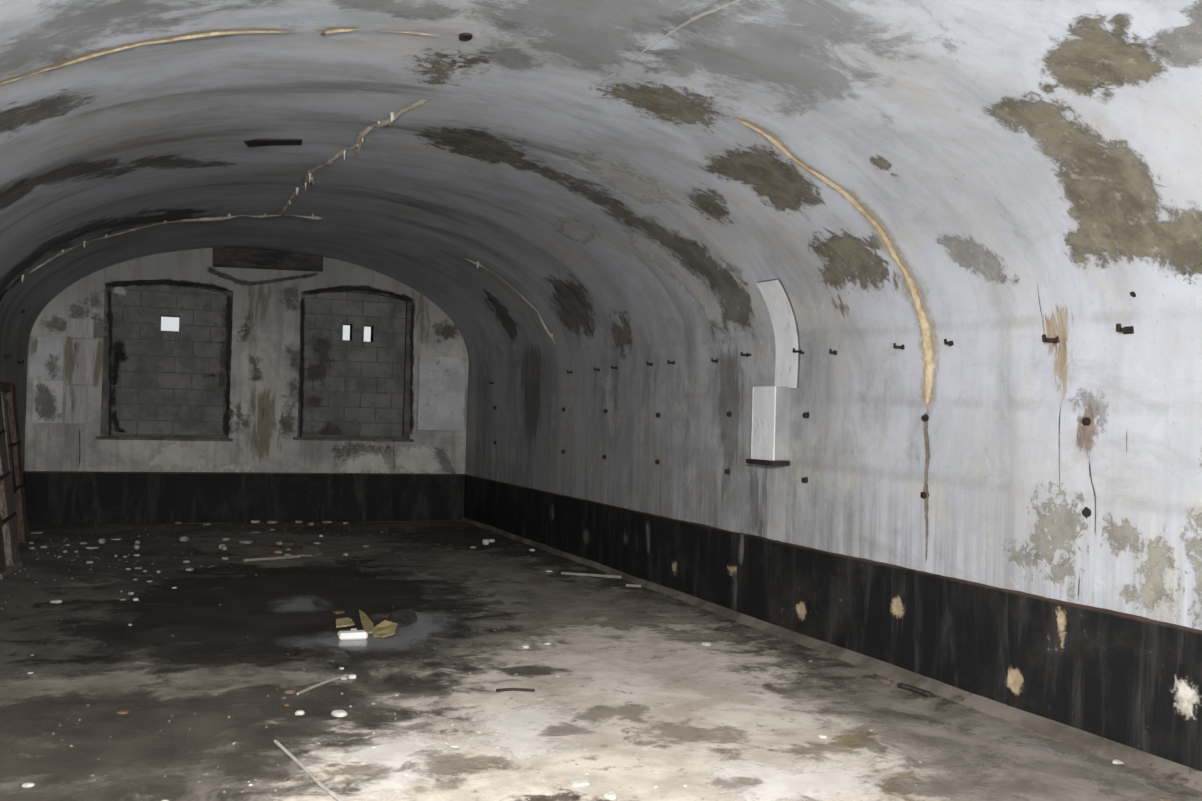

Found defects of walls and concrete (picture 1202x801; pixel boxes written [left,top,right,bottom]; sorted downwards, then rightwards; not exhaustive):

crack [0,31,292,85]
peeling [590,82,724,133]
flaking render [986,0,1202,277]
crack [0,99,428,299]
leakage [420,126,753,342]
flaking render [689,144,825,223]
leakage [35,355,60,420]
leakage [228,348,321,460]
crack [735,118,935,559]
rust [1042,308,1073,396]
rust [1077,406,1099,455]
spalling [1171,675,1201,720]